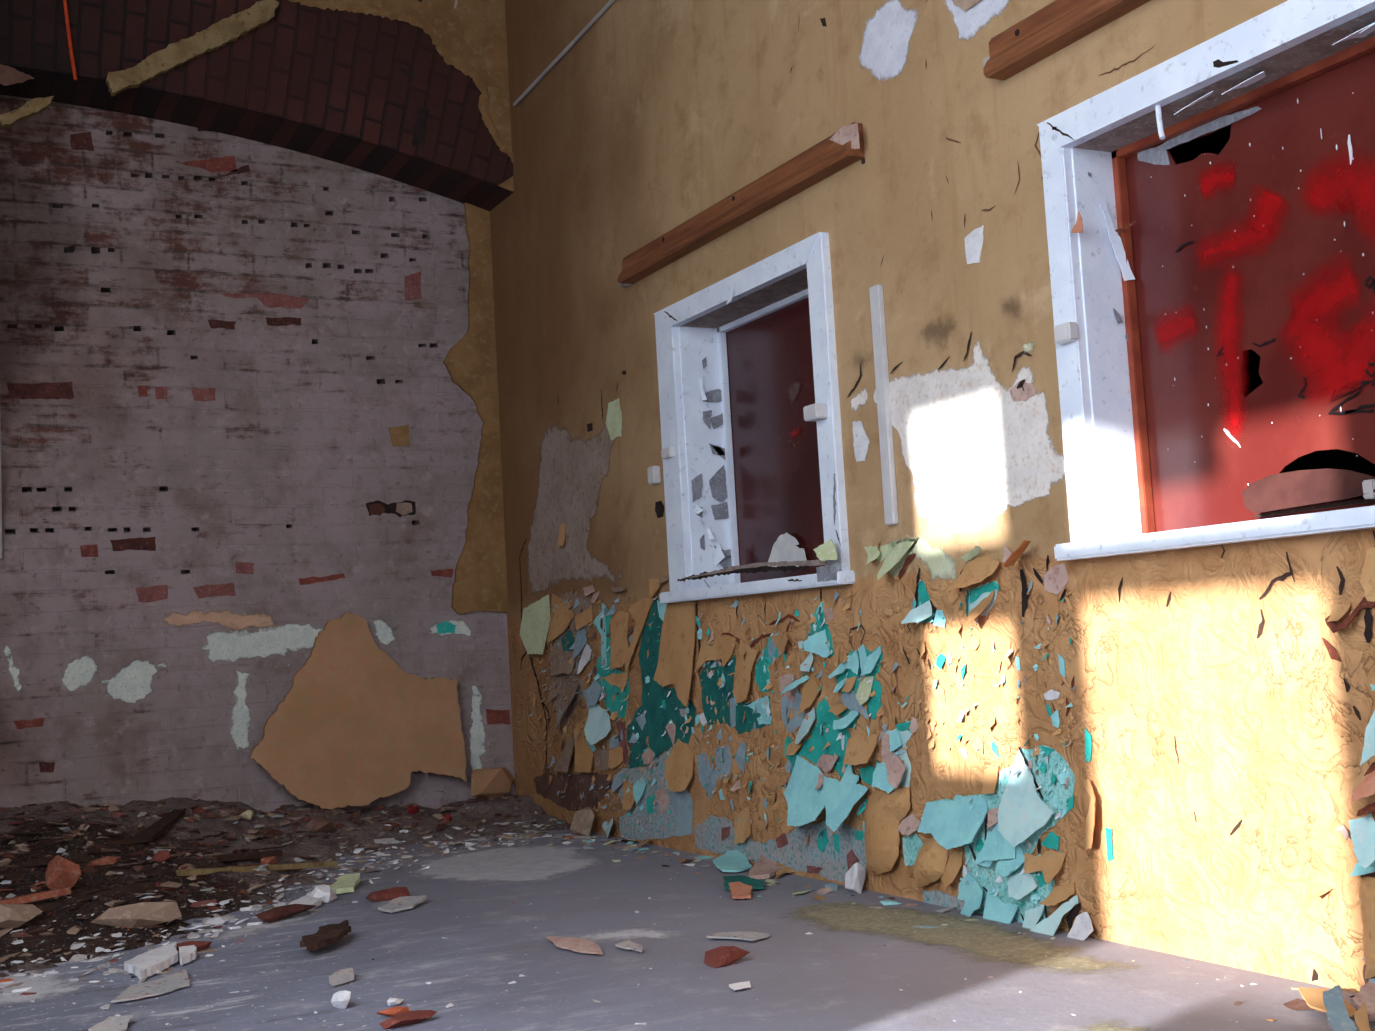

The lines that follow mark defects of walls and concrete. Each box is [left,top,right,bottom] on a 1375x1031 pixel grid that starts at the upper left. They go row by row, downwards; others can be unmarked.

spalling [859,0,917,80]
spalling [945,0,1009,40]
spalling [0,0,514,186]
flaking render [7,382,74,400]
flaking render [80,537,156,557]
spalling [366,500,416,517]
peeling [520,332,1113,941]
peeling [1322,547,1375,662]
peeling [62,656,166,704]
peeling [202,623,323,750]
peeling [469,685,510,771]
peeling [1336,710,1375,1022]